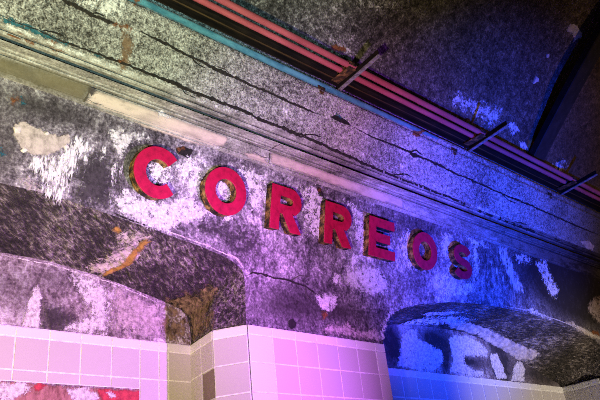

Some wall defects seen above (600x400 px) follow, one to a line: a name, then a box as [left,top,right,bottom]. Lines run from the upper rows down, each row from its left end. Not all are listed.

crack [62,0,117,25]
corrosion [114,23,134,69]
flaking render [13,122,71,156]
crack [0,15,600,256]
damp [28,136,123,208]
corrosion [103,240,151,276]
crack [249,272,321,304]
corrosion [162,287,218,344]